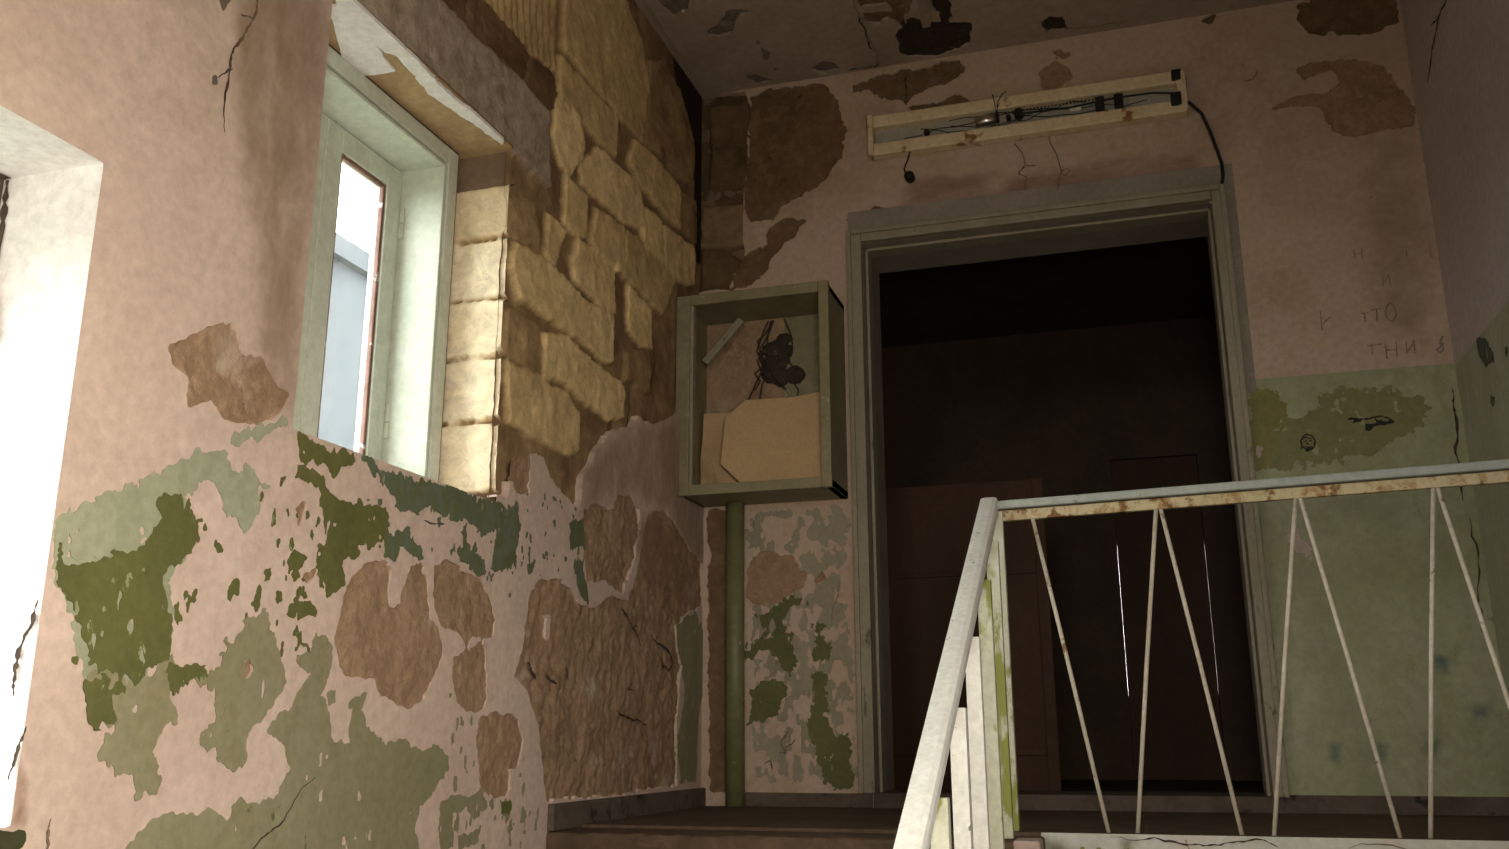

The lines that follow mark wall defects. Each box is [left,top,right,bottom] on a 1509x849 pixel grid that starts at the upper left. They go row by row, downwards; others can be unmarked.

crack [218,0,258,132]
flaking render [1272,59,1416,137]
peeling [1476,337,1508,367]
flaking render [52,0,972,849]
peeling [1248,385,1432,472]
peeling [0,829,26,849]
crack [253,780,312,849]